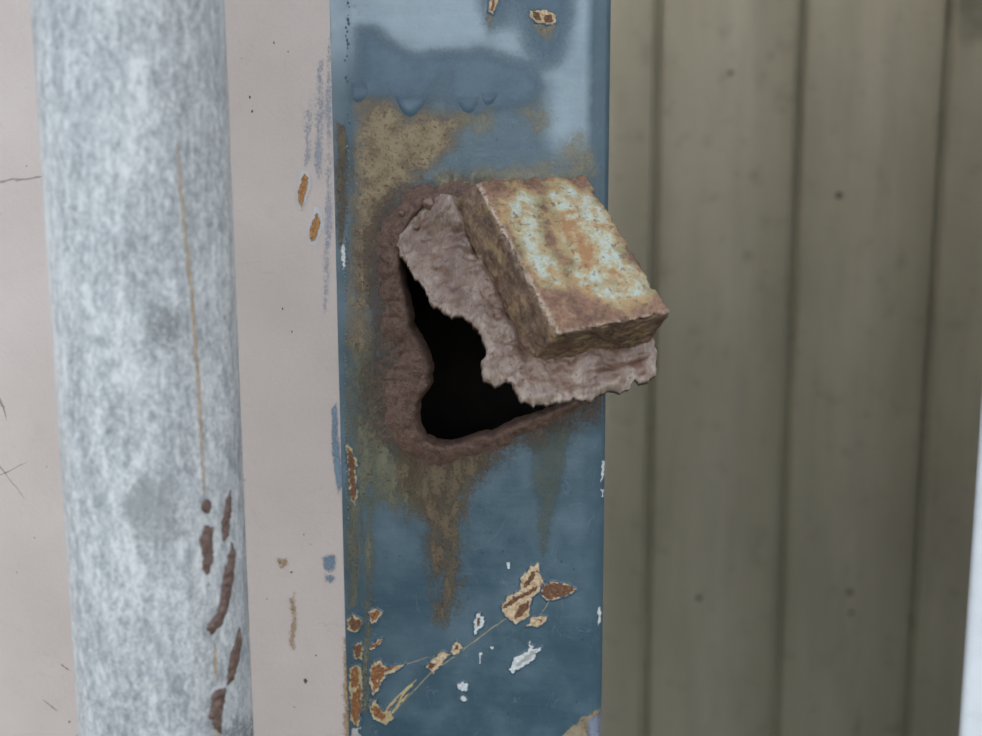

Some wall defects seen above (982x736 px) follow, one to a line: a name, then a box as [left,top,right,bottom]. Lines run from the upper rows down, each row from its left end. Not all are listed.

peeling [486,0,500,16]
peeling [528,8,558,27]
corrosion [335,100,459,353]
corrosion [177,144,242,736]
corrosion [397,451,488,624]
peeling [472,611,486,637]
peeling [499,561,578,675]
peeling [345,606,416,736]
peeling [424,639,464,676]
peeling [455,680,470,703]
peeling [563,707,601,736]